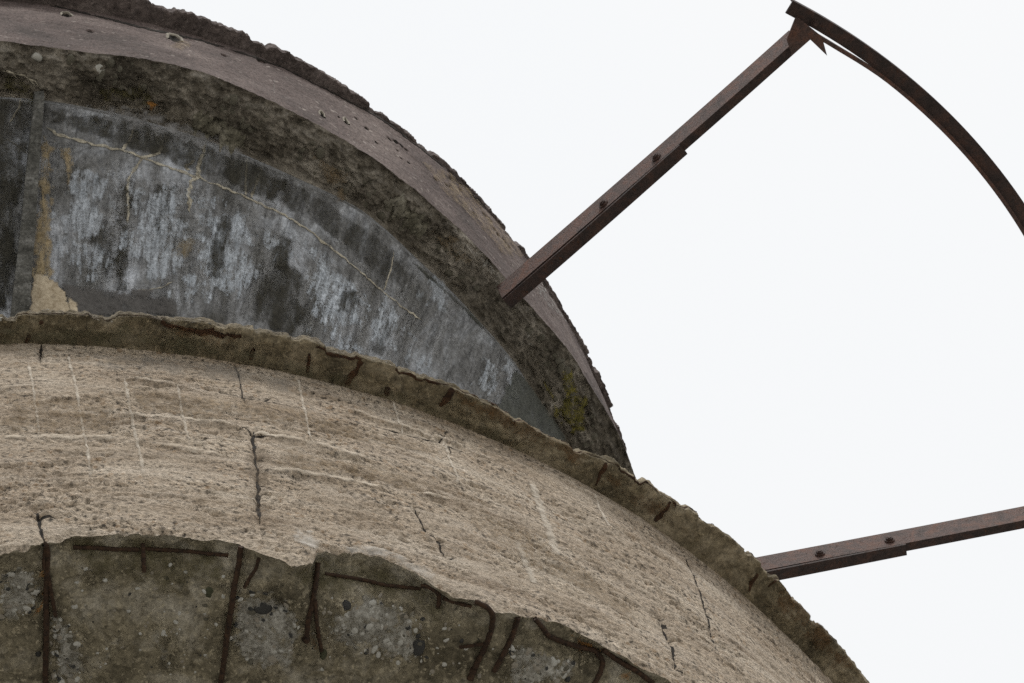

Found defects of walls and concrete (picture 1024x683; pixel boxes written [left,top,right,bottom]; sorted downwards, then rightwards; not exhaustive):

water stain [0,98,30,308]
peeling [0,274,450,383]
water stain [54,108,408,281]
crack [48,128,421,320]
water stain [69,170,404,354]
water stain [479,360,566,440]
crack [239,427,268,524]
spalling [0,541,149,683]
spalling [73,543,655,683]
crack [658,620,683,674]
crack [679,549,720,654]